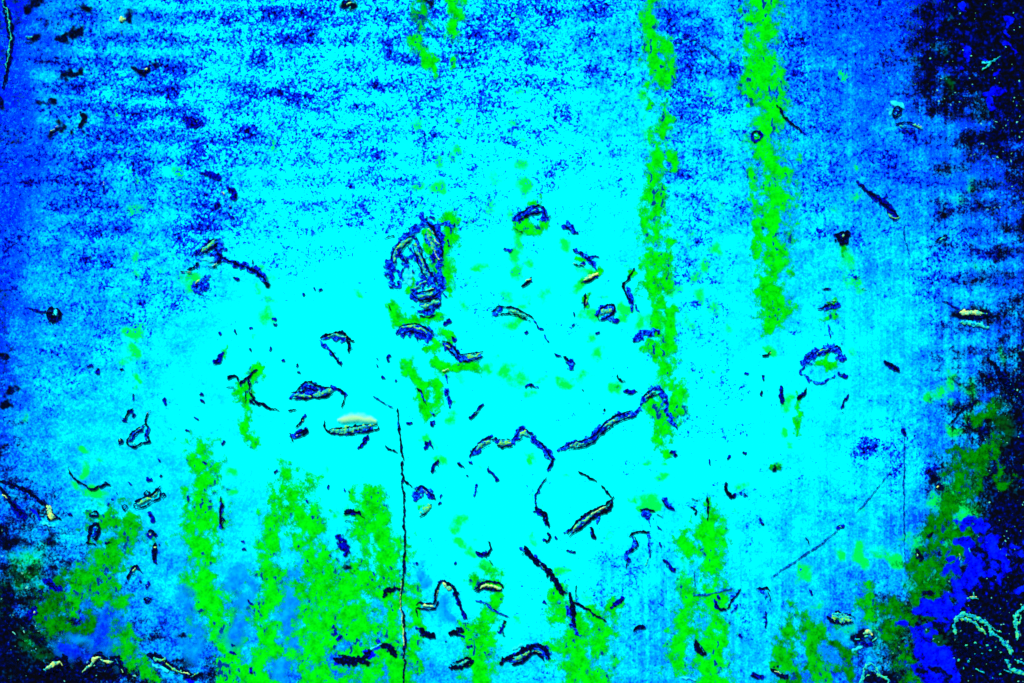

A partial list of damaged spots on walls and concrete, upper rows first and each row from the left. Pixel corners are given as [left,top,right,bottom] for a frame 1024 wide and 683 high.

peeling [512,193,579,236]
crack [216,255,270,288]
peeling [383,211,483,408]
peeling [281,359,348,441]
crack [373,396,412,683]
crack [519,456,612,637]
water stain [0,580,124,683]
water stain [177,588,206,679]
water stain [225,565,258,644]
water stain [270,571,301,683]